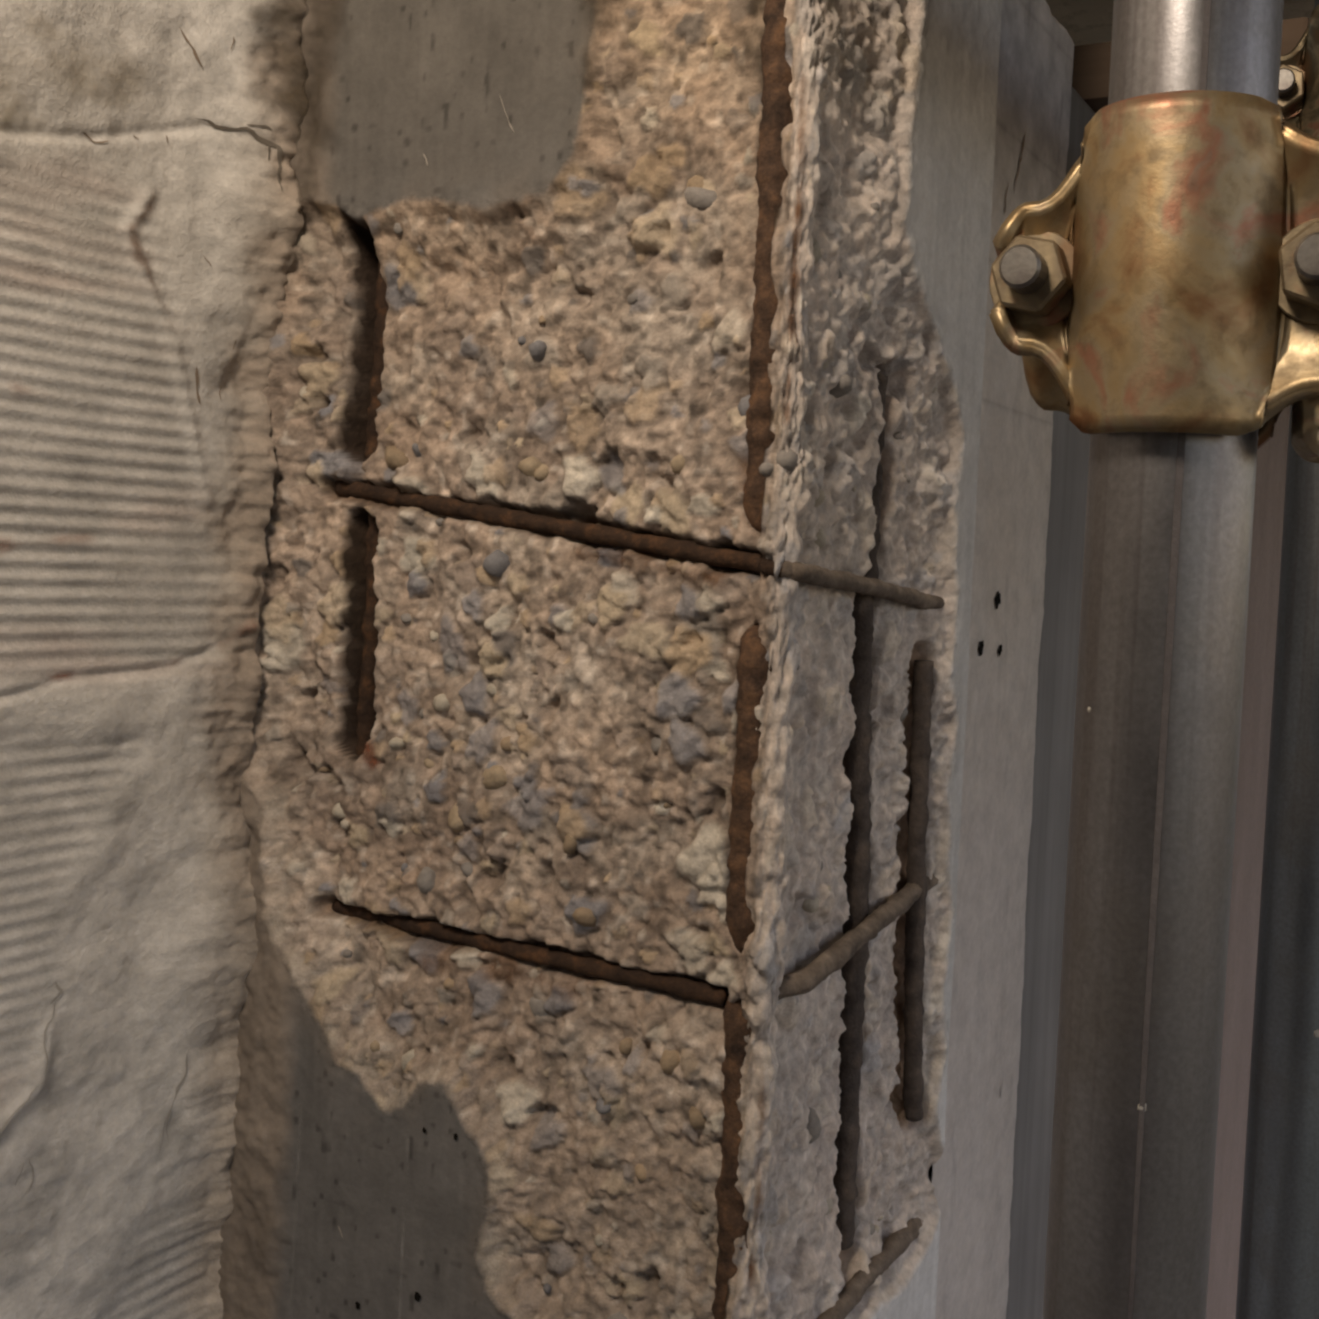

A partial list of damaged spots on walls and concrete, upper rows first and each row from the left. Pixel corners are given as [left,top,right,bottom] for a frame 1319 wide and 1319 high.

crack [83,132,168,143]
crack [196,118,283,190]
spalling [241,0,967,1319]
crack [0,983,63,1134]